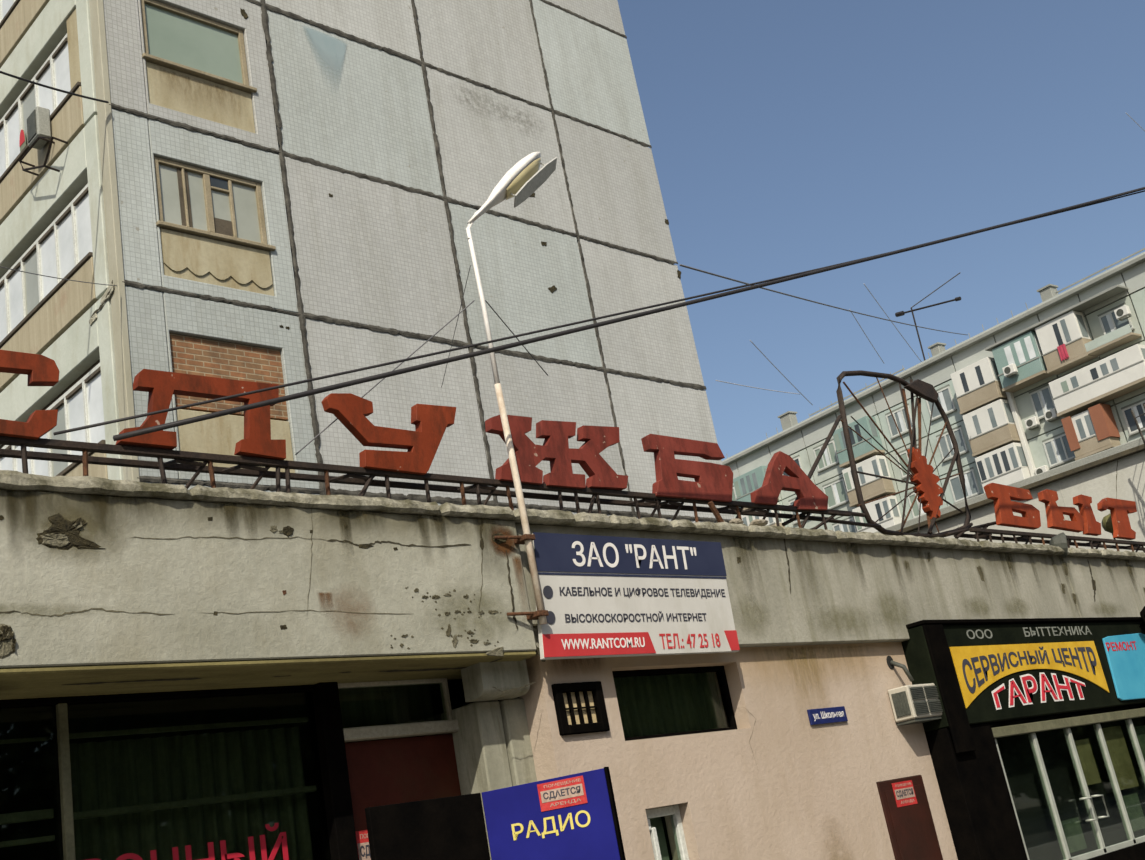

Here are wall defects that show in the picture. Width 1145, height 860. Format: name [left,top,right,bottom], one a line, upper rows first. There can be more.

spalling [36,509,105,550]
crack [131,509,546,662]
crack [0,608,169,617]
peeling [406,587,502,648]
spalling [0,624,16,659]